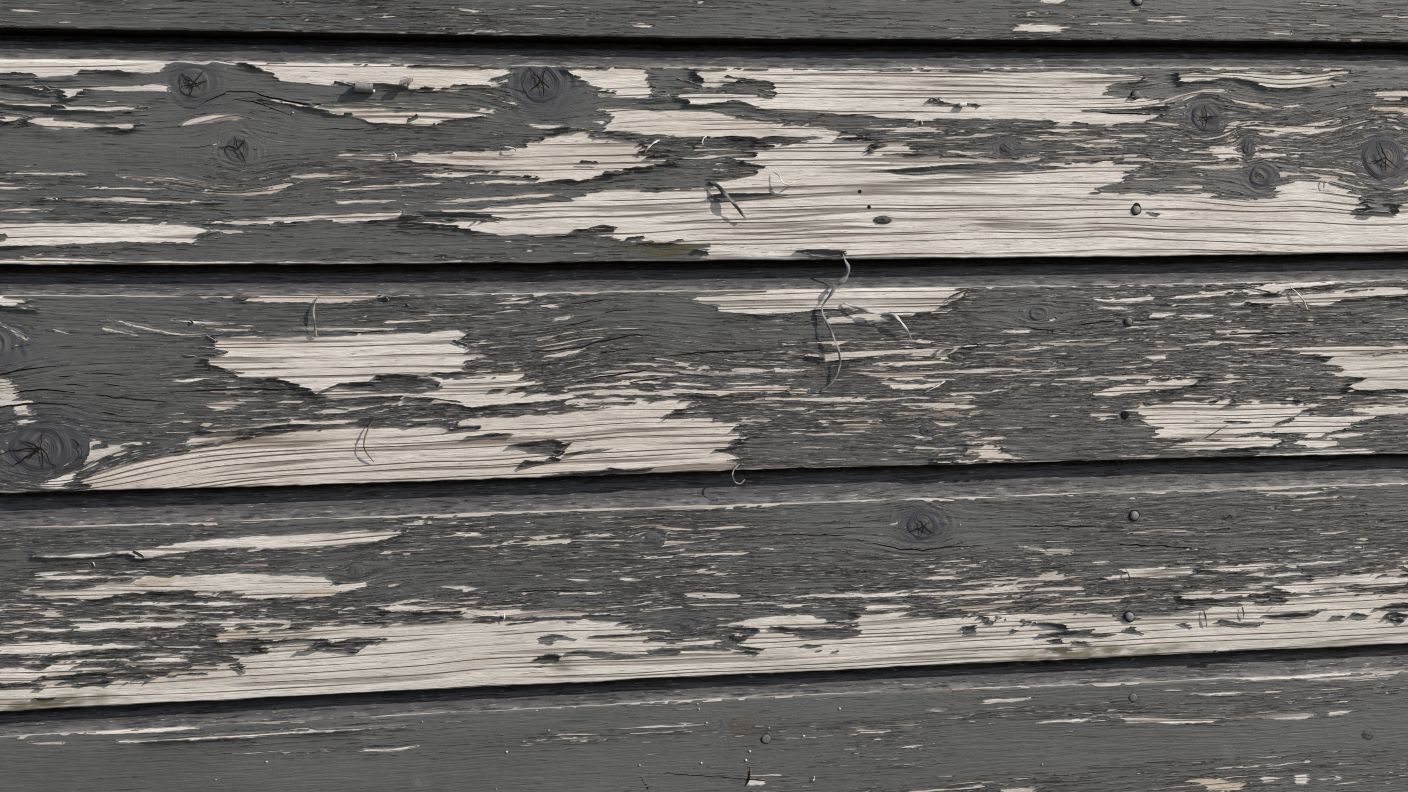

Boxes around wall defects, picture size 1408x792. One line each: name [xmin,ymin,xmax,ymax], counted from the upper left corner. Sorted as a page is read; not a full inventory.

peeling [0,59,1408,265]
peeling [688,288,967,323]
peeling [1090,282,1408,318]
peeling [36,295,1025,490]
peeling [1092,328,1408,456]
peeling [34,529,407,558]
peeling [0,545,1408,711]